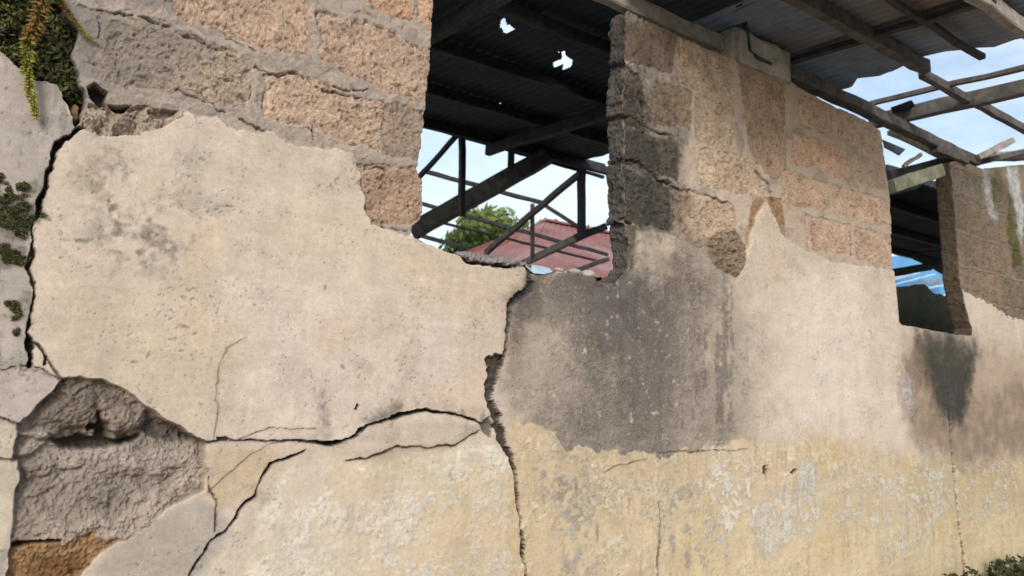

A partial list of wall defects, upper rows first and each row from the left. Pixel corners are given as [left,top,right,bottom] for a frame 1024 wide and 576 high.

crack [0,124,83,382]
spalling [0,0,187,138]
spalling [599,12,645,284]
spalling [936,161,972,336]
spalling [4,375,232,576]
crack [187,269,534,576]
leakage [930,348,970,419]